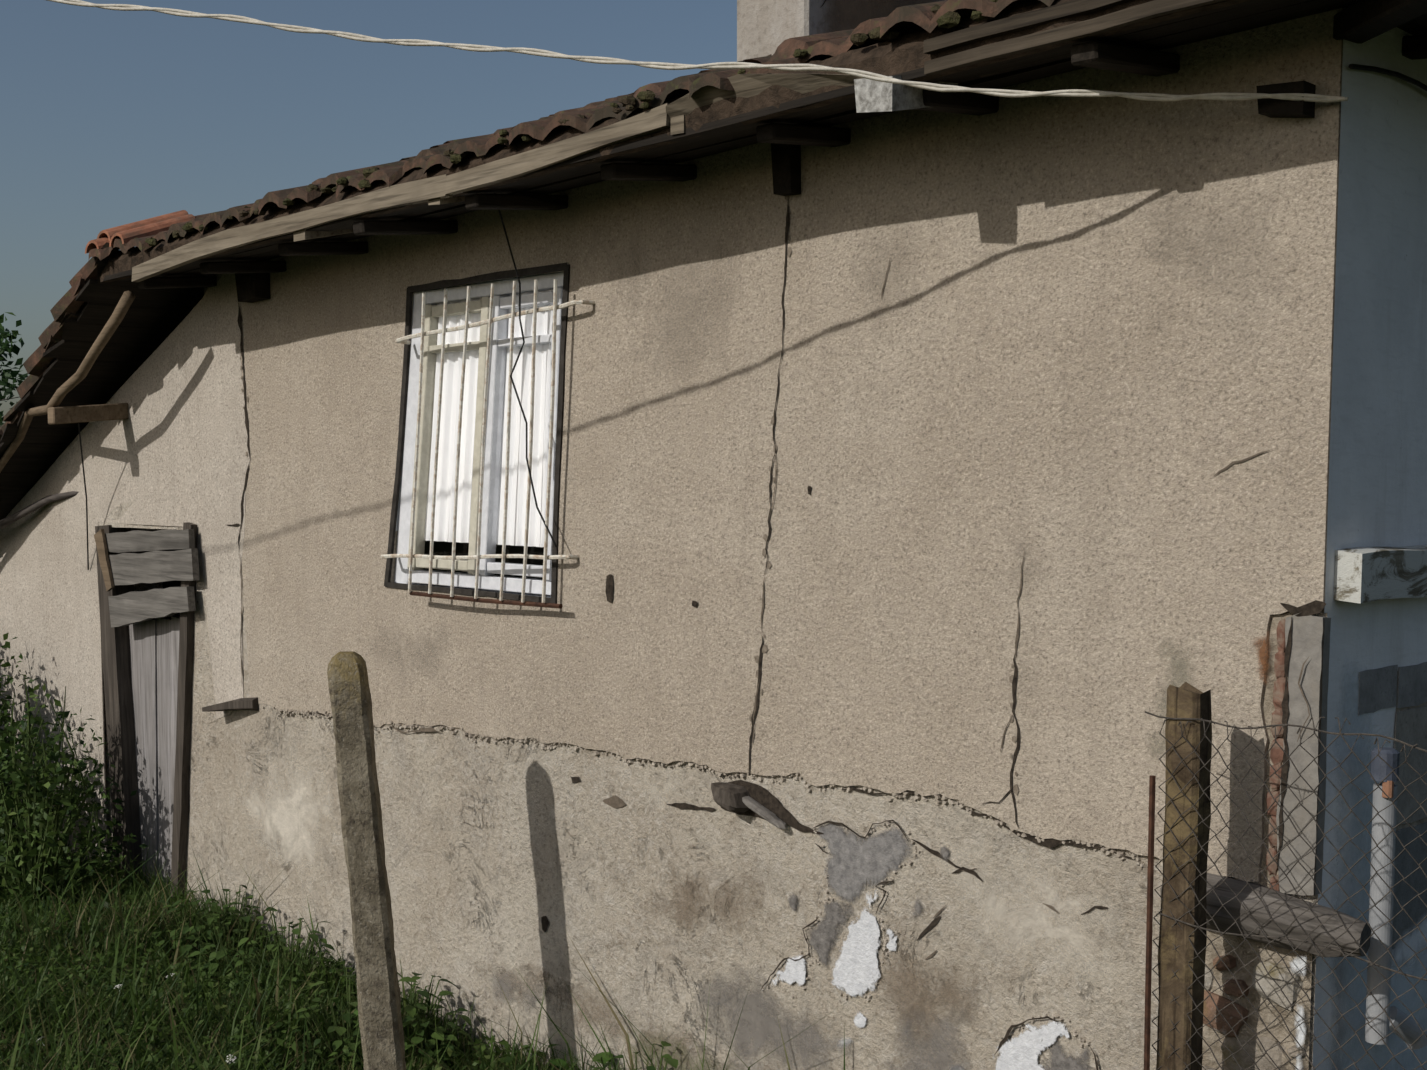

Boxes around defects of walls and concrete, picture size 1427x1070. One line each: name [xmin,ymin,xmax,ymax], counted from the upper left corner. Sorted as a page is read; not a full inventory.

crack [227,302,250,673]
crack [749,196,792,773]
crack [390,725,439,733]
crack [667,803,715,812]
crack [779,817,824,834]
spalling [760,820,970,1044]
crack [842,550,1132,859]
spalling [993,1013,1100,1070]
flaking render [1258,614,1292,895]